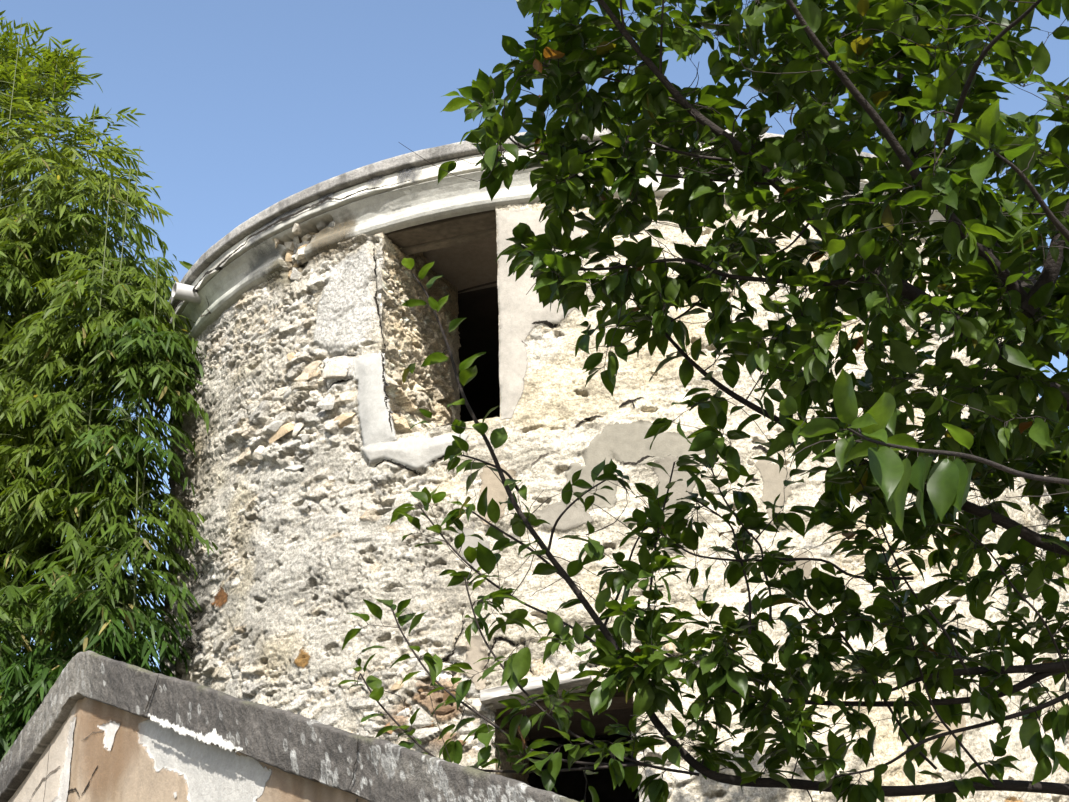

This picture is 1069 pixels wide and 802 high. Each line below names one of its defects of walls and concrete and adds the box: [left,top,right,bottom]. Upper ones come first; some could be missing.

peeling [51,717,76,802]
crack [29,766,98,802]
peeling [138,719,272,802]